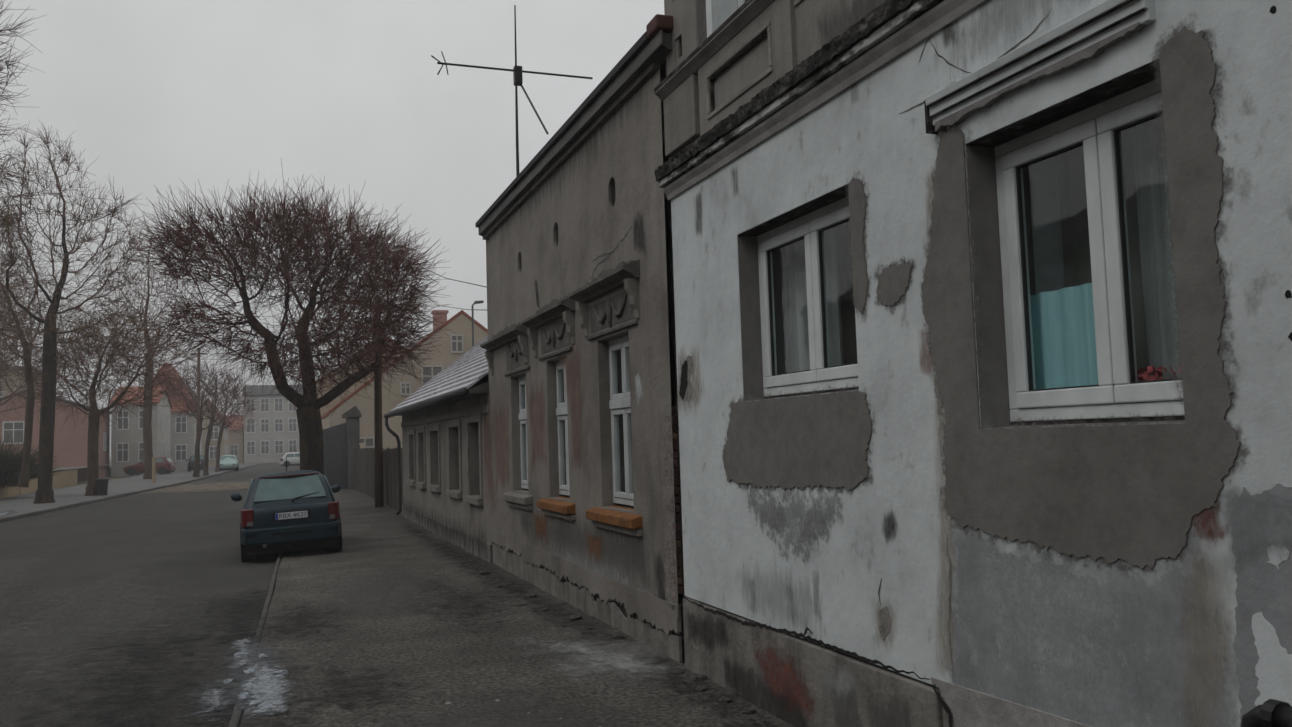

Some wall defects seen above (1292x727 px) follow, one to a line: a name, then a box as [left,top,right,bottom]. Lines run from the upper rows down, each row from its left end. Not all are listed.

damp [404,507,808,727]
crack [683,537,953,727]
peeling [1198,483,1292,727]